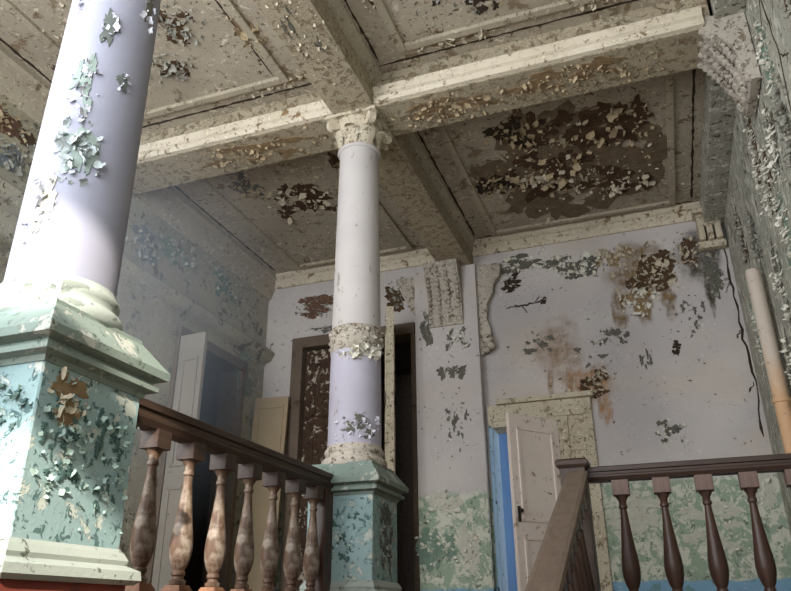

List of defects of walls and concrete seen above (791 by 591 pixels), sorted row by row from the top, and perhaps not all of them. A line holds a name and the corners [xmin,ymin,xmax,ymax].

peeling [99,8,120,46]
peeling [140,0,213,88]
peeling [0,53,106,237]
peeling [199,127,338,241]
peeling [405,52,682,225]
crack [676,69,696,204]
peeling [730,0,791,385]
peeling [293,294,333,334]
crack [506,297,544,313]
peeling [499,233,730,399]
crack [724,249,764,437]
peeling [30,366,138,514]